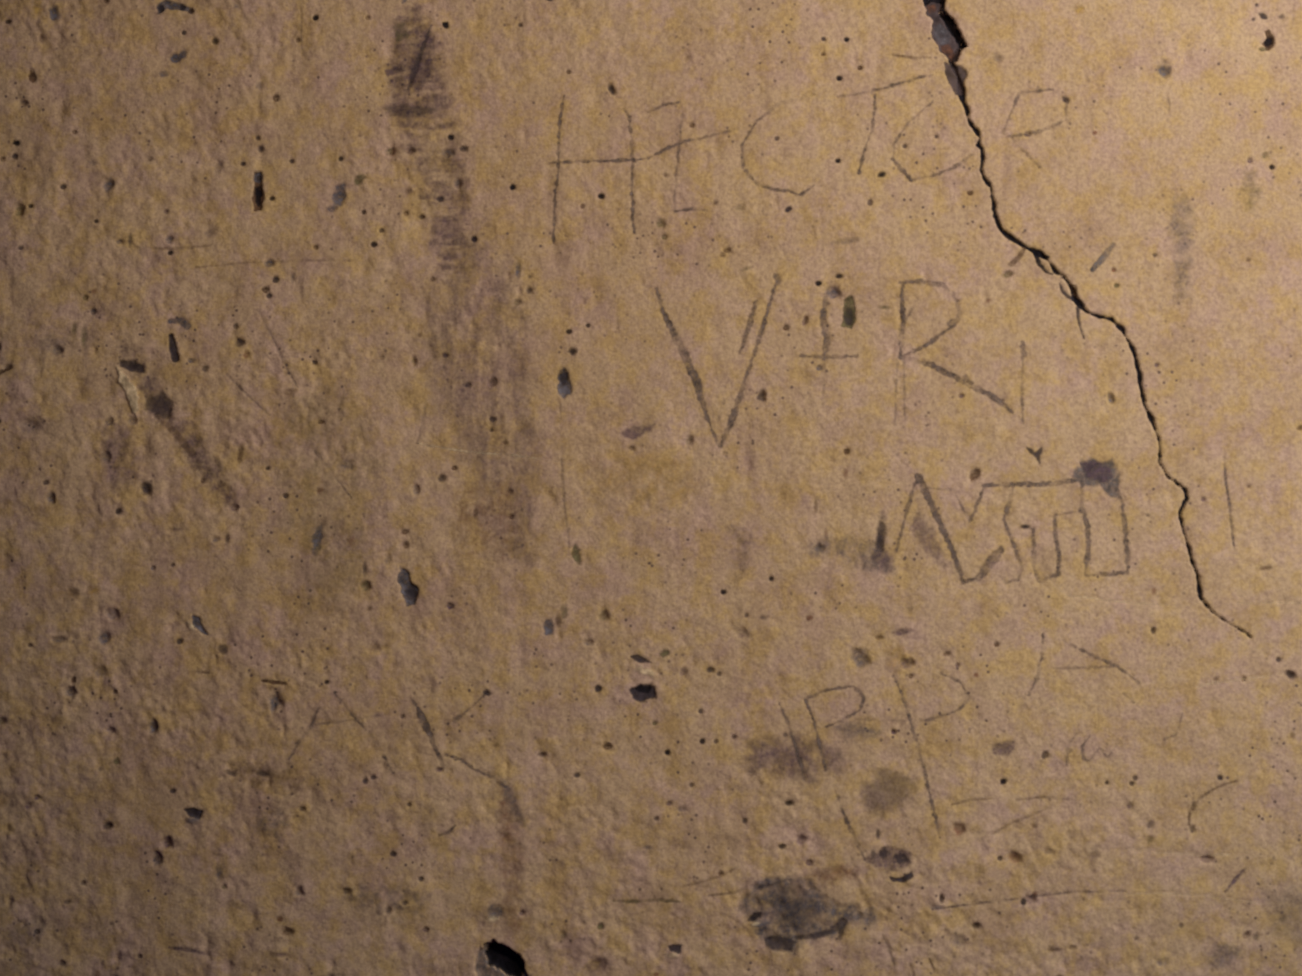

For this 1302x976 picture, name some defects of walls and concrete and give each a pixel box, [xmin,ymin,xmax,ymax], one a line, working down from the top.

crack [923,0,1251,638]